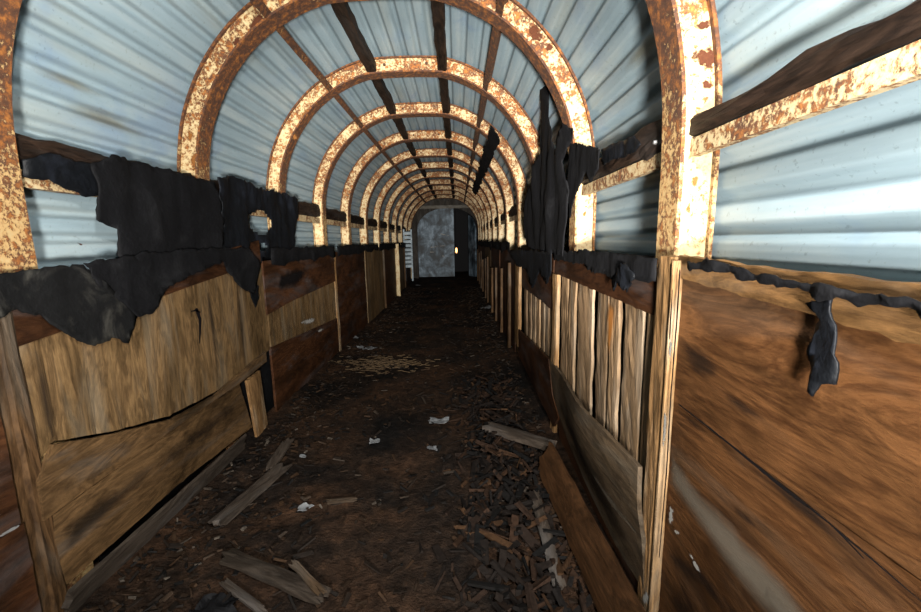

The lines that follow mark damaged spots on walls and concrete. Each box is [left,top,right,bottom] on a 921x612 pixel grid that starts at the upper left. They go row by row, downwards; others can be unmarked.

rust [529,25,554,50]
rust [691,45,714,88]
crack [659,265,921,602]